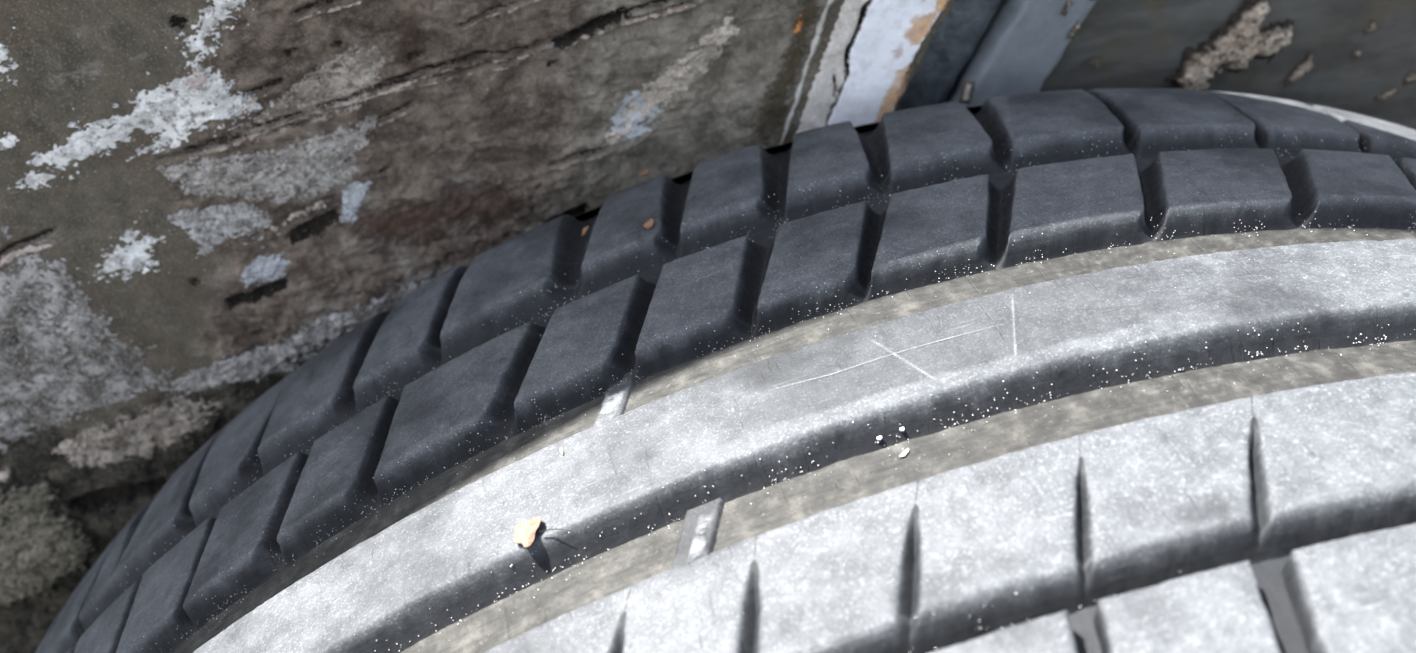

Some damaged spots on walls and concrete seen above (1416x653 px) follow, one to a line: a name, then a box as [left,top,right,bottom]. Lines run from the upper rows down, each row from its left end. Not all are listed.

spalling [1163,0,1295,90]
spalling [1279,52,1317,88]